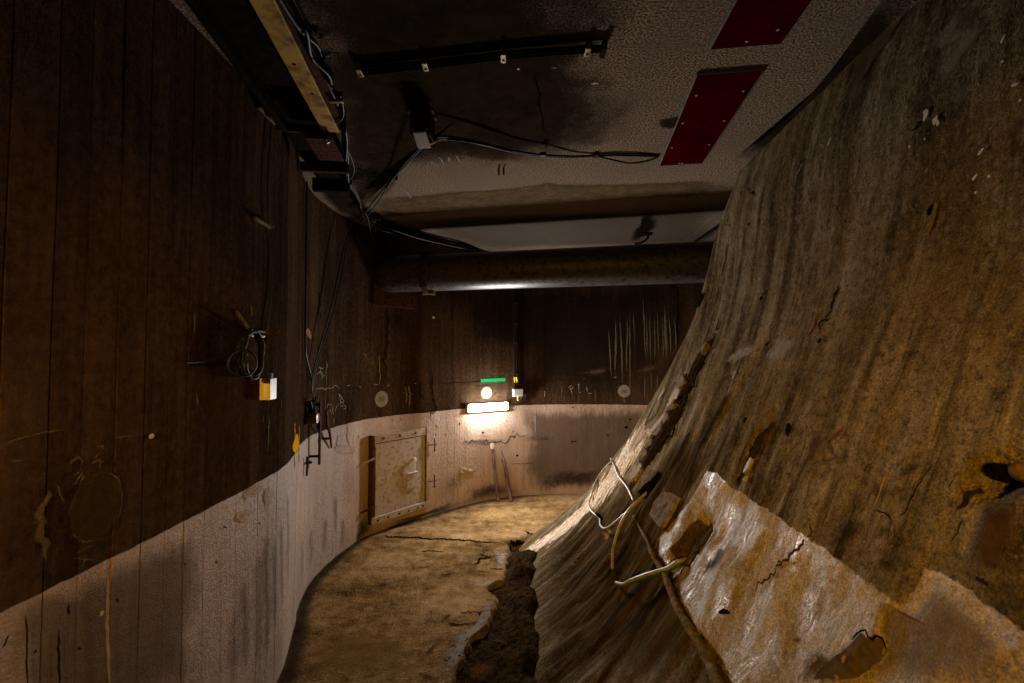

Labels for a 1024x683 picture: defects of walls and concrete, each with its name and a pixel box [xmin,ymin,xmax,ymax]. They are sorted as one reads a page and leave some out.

crack [818,284,840,336]
crack [463,433,576,464]
spalling [625,338,715,531]
crack [385,531,534,575]
crack [755,525,812,590]
peeling [813,633,884,679]